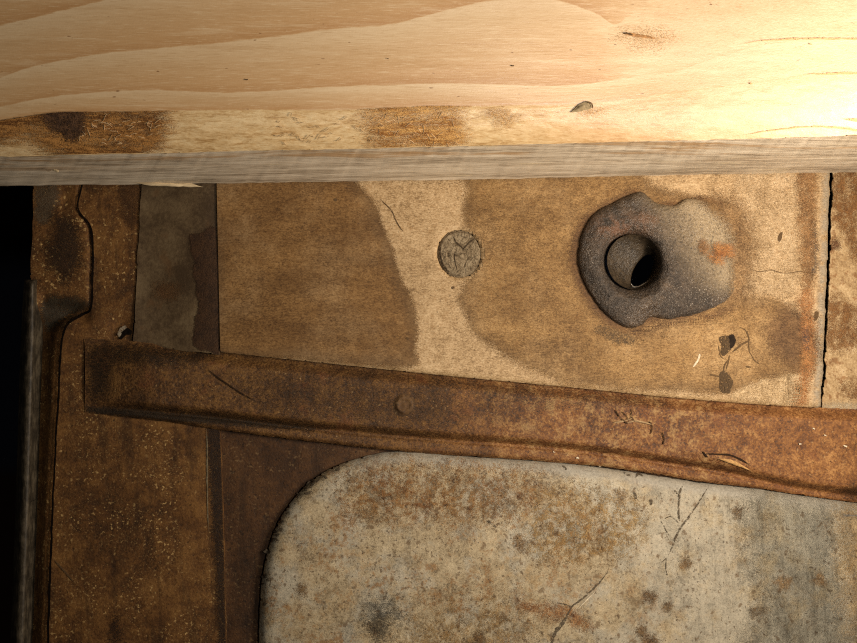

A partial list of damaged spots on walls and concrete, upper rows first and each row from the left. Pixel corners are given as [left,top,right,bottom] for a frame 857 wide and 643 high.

leakage [217,181,421,370]
leakage [455,175,825,399]
crack [754,173,833,407]
crack [47,185,94,643]